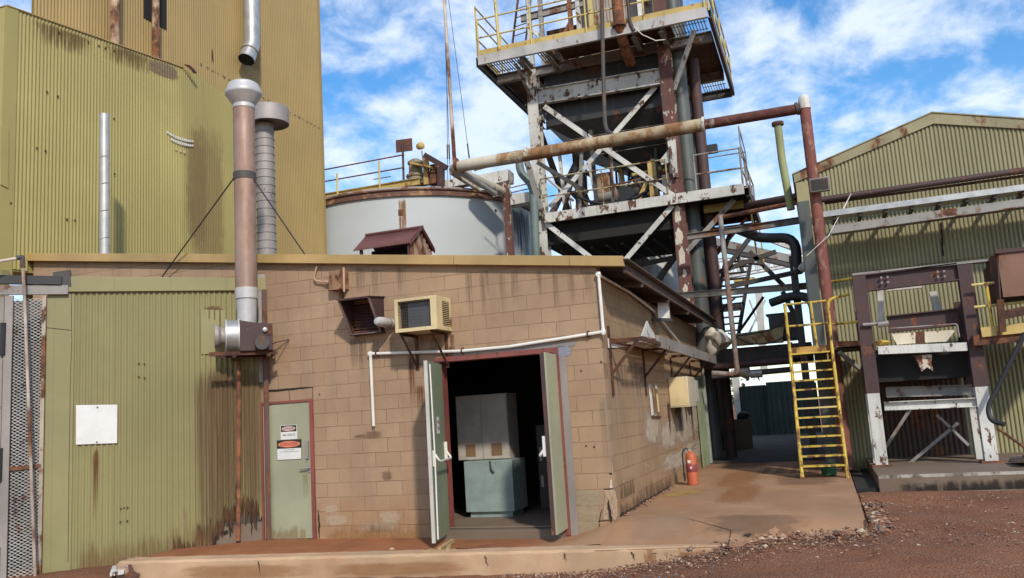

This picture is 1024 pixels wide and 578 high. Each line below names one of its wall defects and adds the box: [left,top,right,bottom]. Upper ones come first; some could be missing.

rust [173,487,260,550]